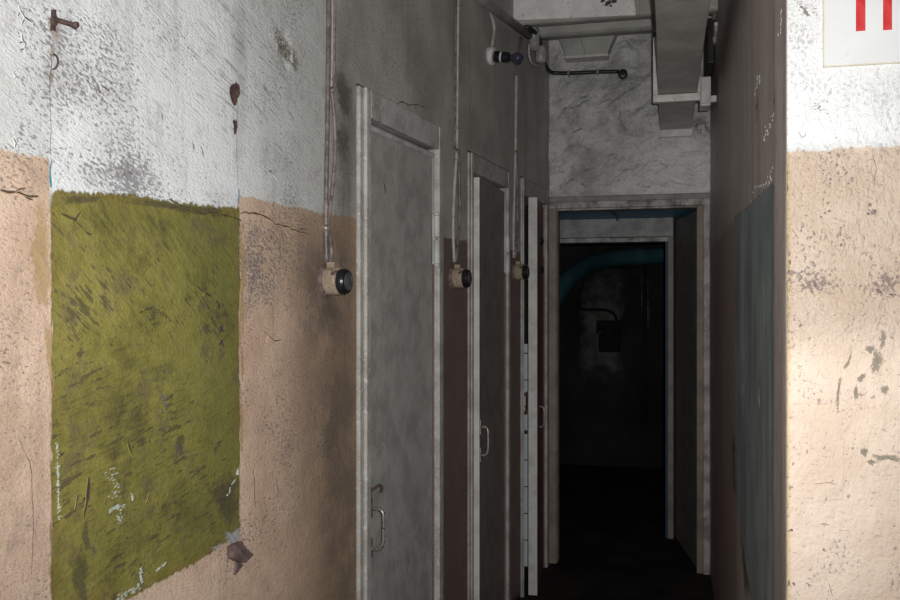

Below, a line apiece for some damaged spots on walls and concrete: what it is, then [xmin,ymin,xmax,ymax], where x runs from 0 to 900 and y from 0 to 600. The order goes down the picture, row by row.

rust [230,83,240,106]
crack [0,187,39,201]
crack [241,208,312,237]